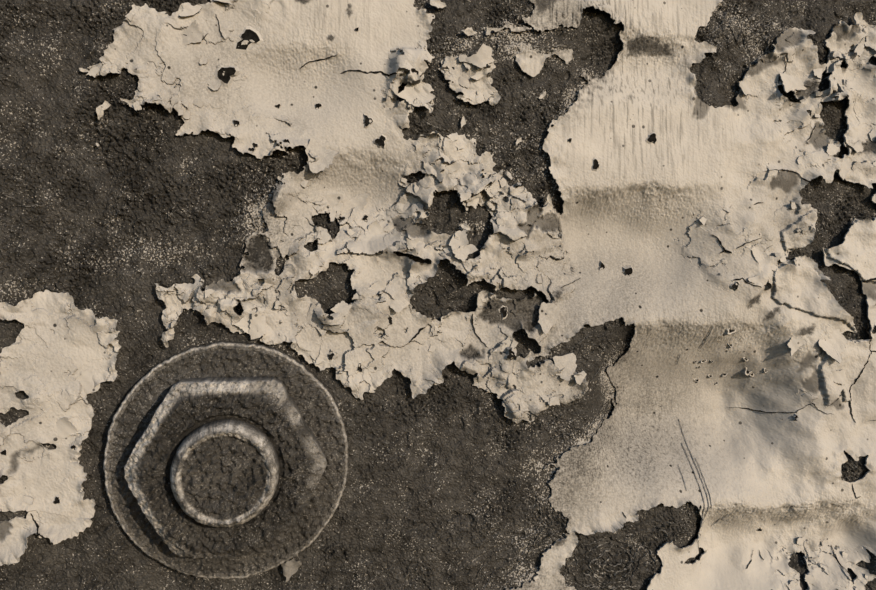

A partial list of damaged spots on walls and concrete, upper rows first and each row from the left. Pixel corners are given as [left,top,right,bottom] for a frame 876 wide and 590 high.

peeling [645,132,657,144]
peeling [673,0,876,421]
peeling [0,0,635,590]
crack [729,323,876,423]
peeling [560,501,702,590]